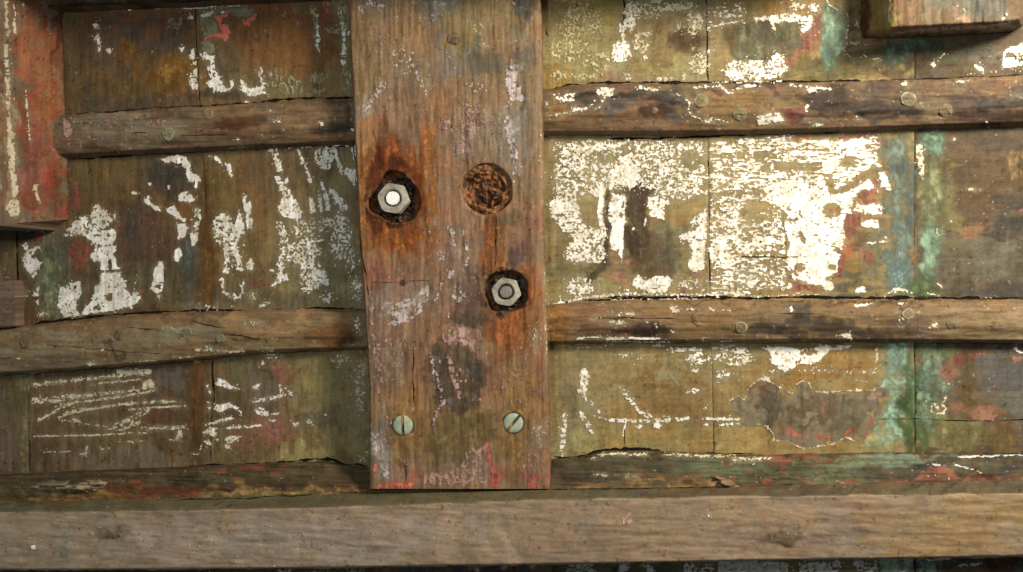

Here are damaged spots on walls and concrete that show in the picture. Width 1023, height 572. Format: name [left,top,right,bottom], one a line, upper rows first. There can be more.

peeling [63,118,117,145]
peeling [57,204,166,319]
peeling [131,145,503,489]
peeling [168,0,529,191]
rust [357,130,437,253]
crack [491,218,499,269]
rust [481,216,536,348]
peeling [498,0,1023,488]
peeling [32,341,245,457]